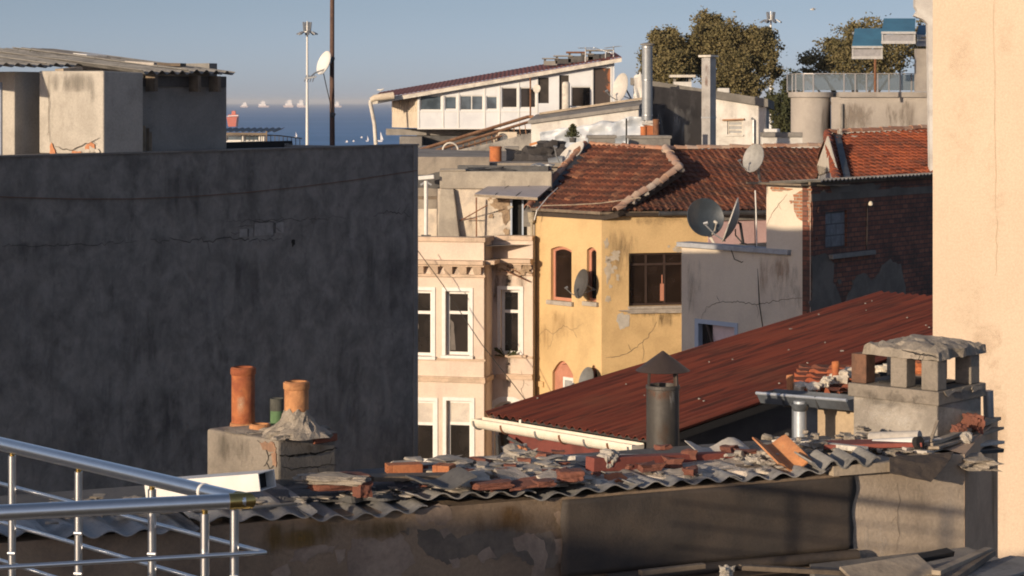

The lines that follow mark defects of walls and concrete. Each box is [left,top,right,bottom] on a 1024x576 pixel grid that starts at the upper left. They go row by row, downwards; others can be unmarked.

flaking render [72,142,100,153]
spalling [770,186,820,253]
peeling [604,237,620,303]
crack [257,440,337,472]
flaking render [271,504,562,576]